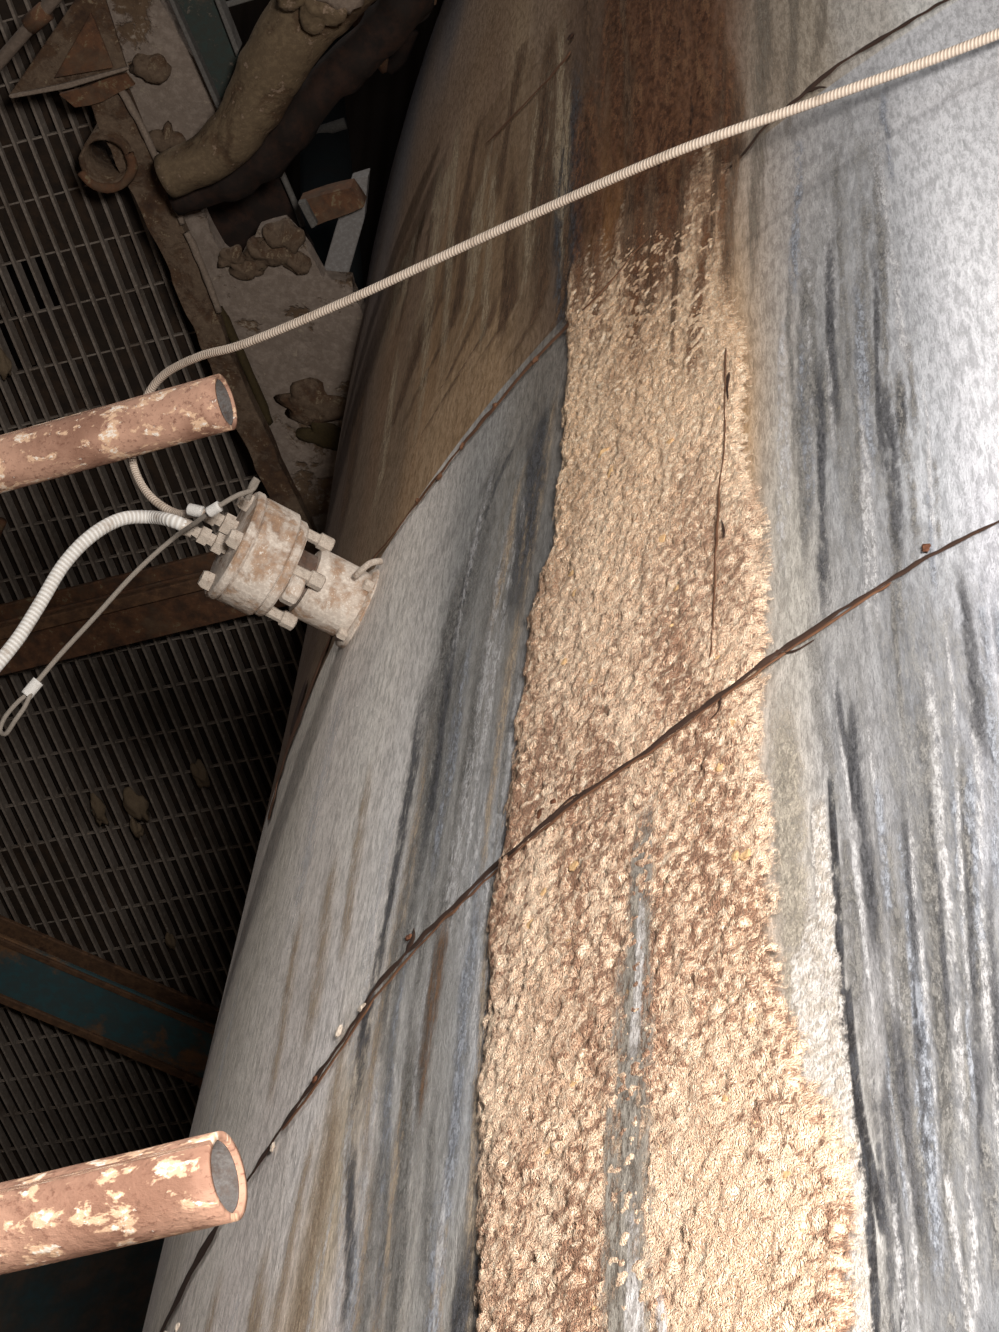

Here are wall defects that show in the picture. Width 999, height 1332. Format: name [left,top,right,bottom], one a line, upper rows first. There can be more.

damp [308,408,554,1332]
damp [374,35,583,499]
rust [571,0,745,372]
spalling [473,130,872,1332]
damp [749,0,773,265]
damp [779,96,999,1332]